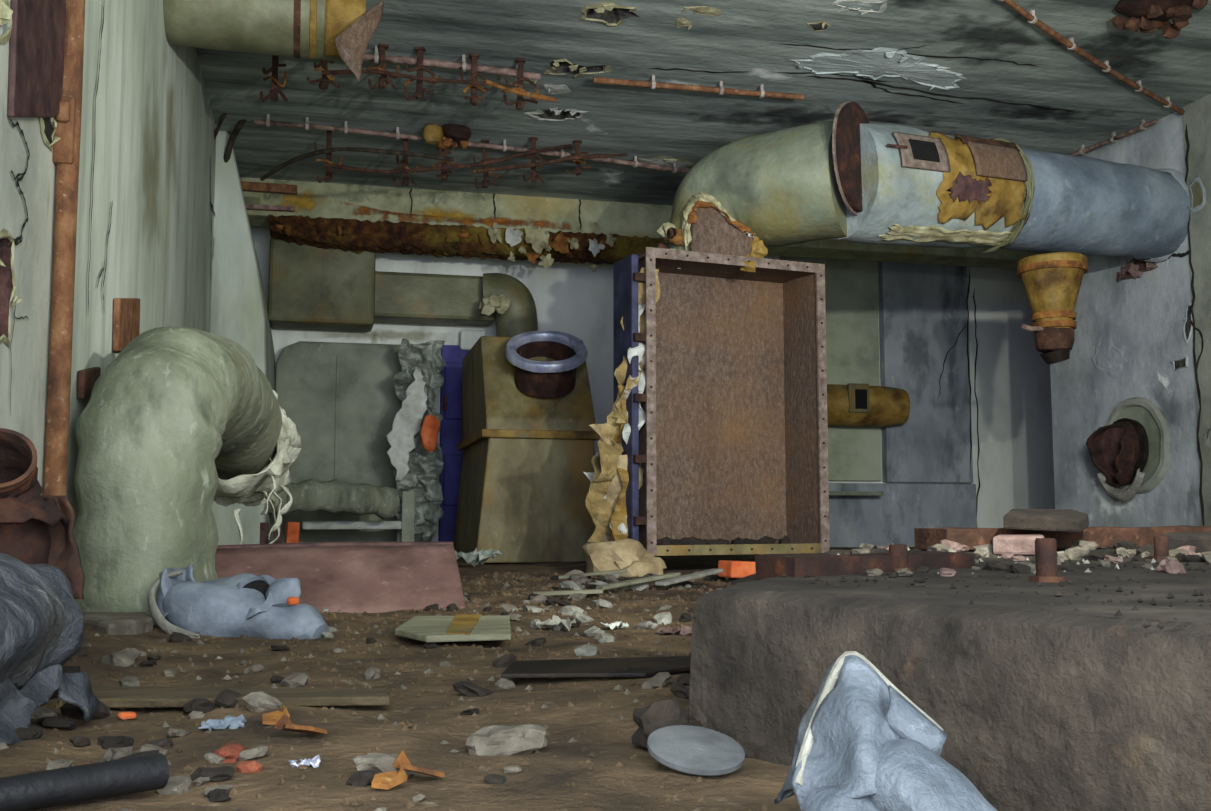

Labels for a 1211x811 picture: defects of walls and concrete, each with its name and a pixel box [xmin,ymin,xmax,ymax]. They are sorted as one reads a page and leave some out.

spalling [579,1,640,27]
spalling [496,58,611,122]
spalling [0,229,23,348]
crack [0,119,30,409]
rust [269,191,665,265]
flaking render [488,223,617,272]
crack [1154,124,1211,526]